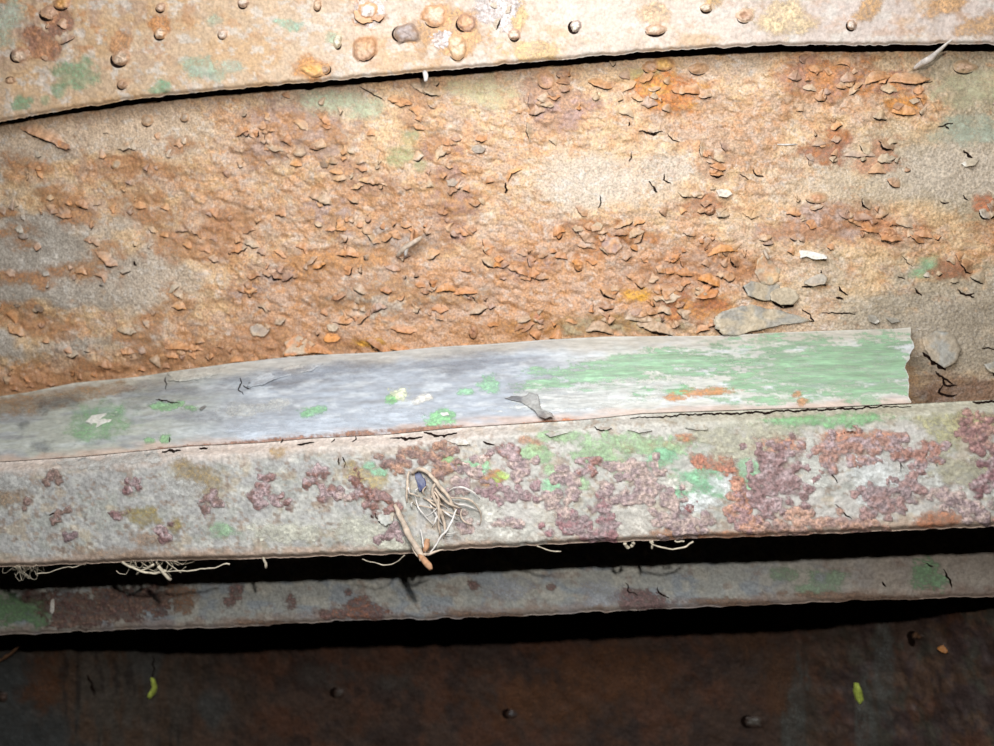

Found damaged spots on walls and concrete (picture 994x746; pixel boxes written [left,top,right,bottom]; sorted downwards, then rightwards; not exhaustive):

spalling [22,9,75,61]
rust [392,3,491,63]
crack [0,43,994,124]
rust [497,4,568,90]
spalling [517,61,712,146]
spalling [781,53,930,121]
rust [0,114,261,291]
spalling [229,91,942,342]
rust [0,309,424,413]
peeling [922,330,962,368]
rust [302,463,404,546]
rust [336,408,994,543]